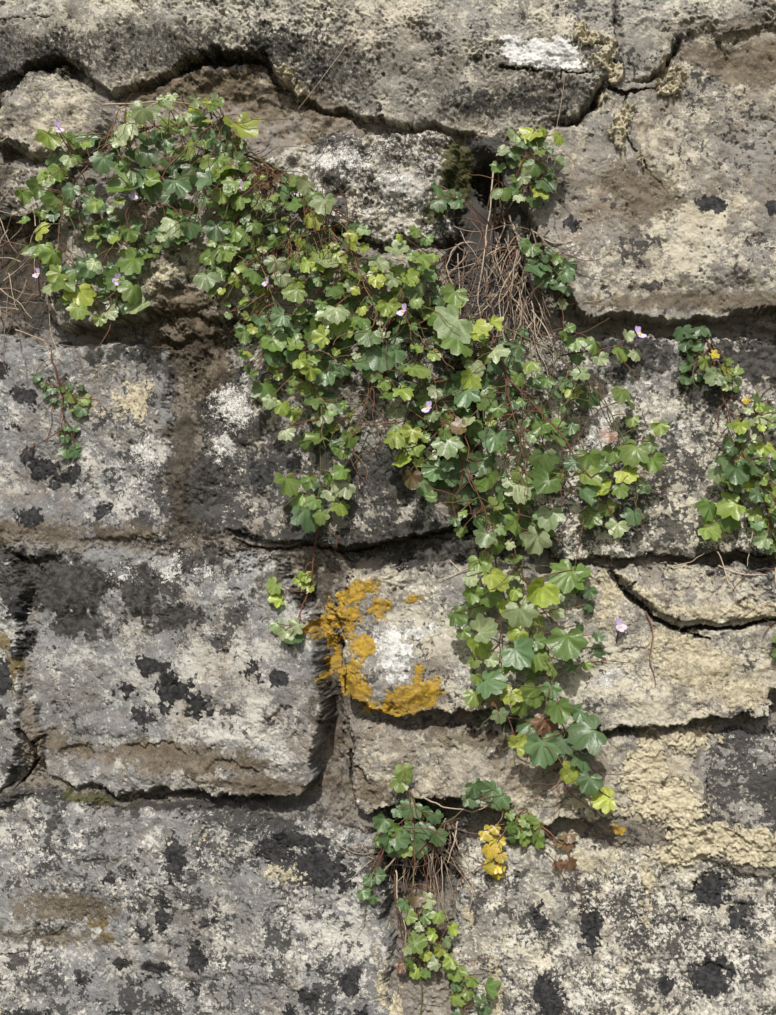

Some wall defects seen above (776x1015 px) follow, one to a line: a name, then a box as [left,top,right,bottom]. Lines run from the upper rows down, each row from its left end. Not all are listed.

crack [607,569,776,640]
crack [13,728,45,790]